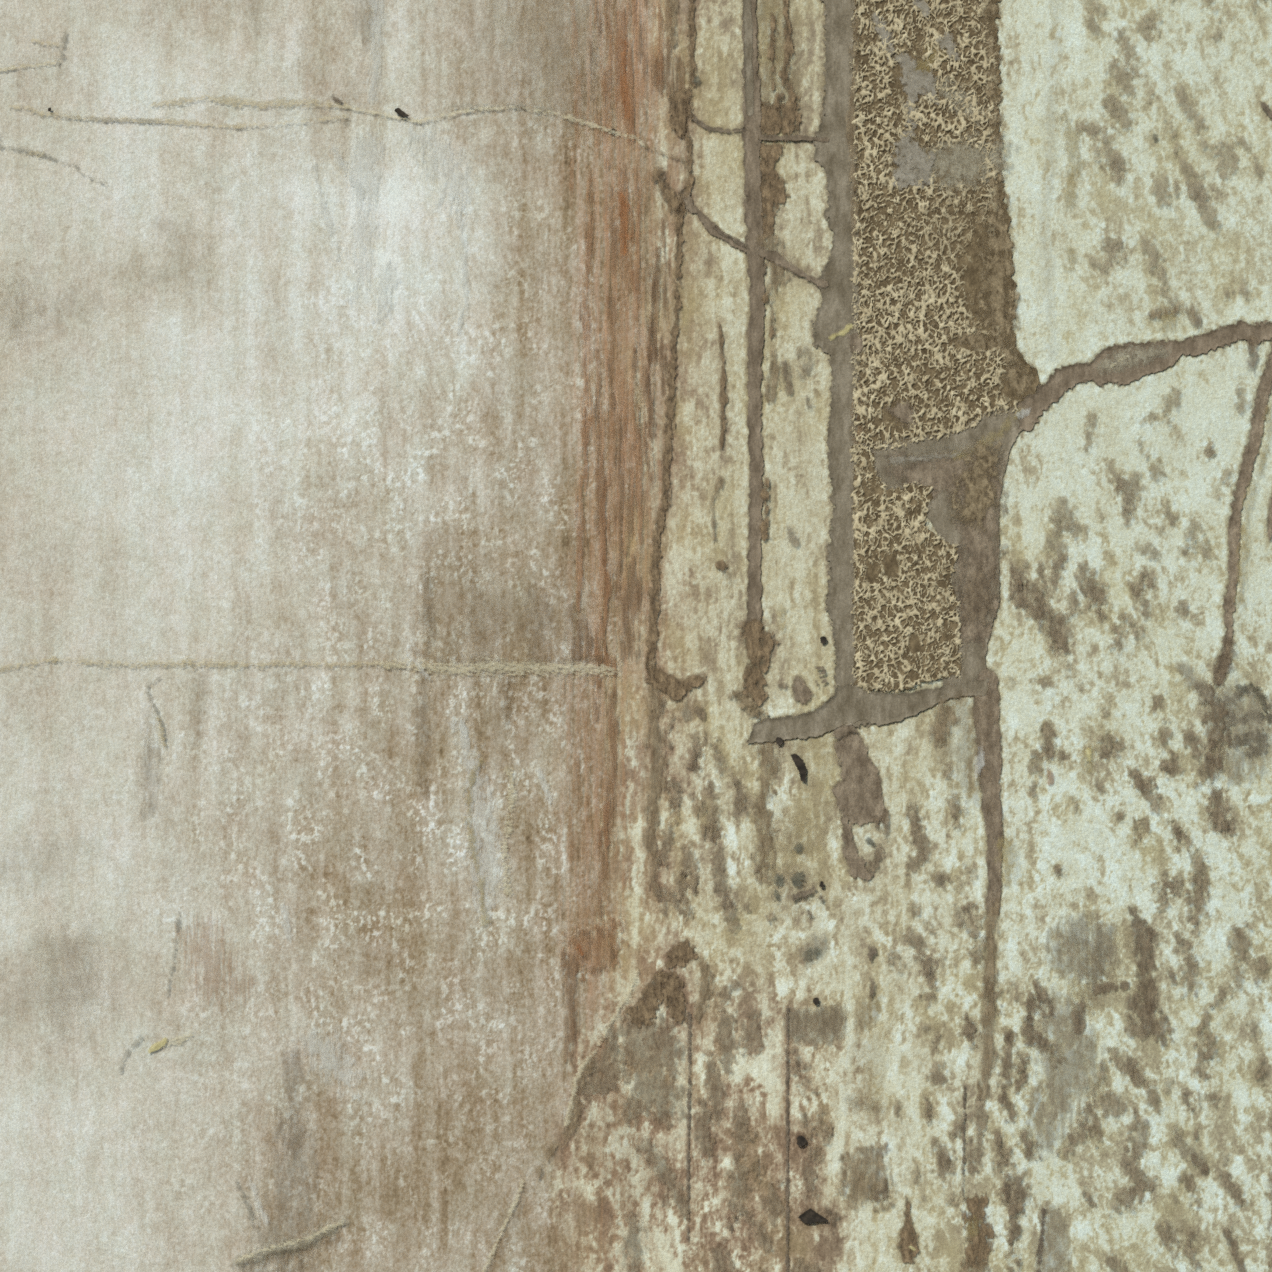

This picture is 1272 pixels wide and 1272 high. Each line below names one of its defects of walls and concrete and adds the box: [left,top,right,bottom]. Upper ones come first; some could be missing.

rust [620,6,685,117]
rust [609,186,629,271]
spalling [849,0,1153,696]
crack [1016,304,1272,685]
rust [560,220,669,1062]
crack [332,0,1004,1197]
damp [750,742,779,883]
damp [1193,682,1272,829]
damp [1071,1002,1086,1033]
damp [1092,981,1130,994]
damp [960,1193,996,1272]
damp [1036,1208,1047,1272]